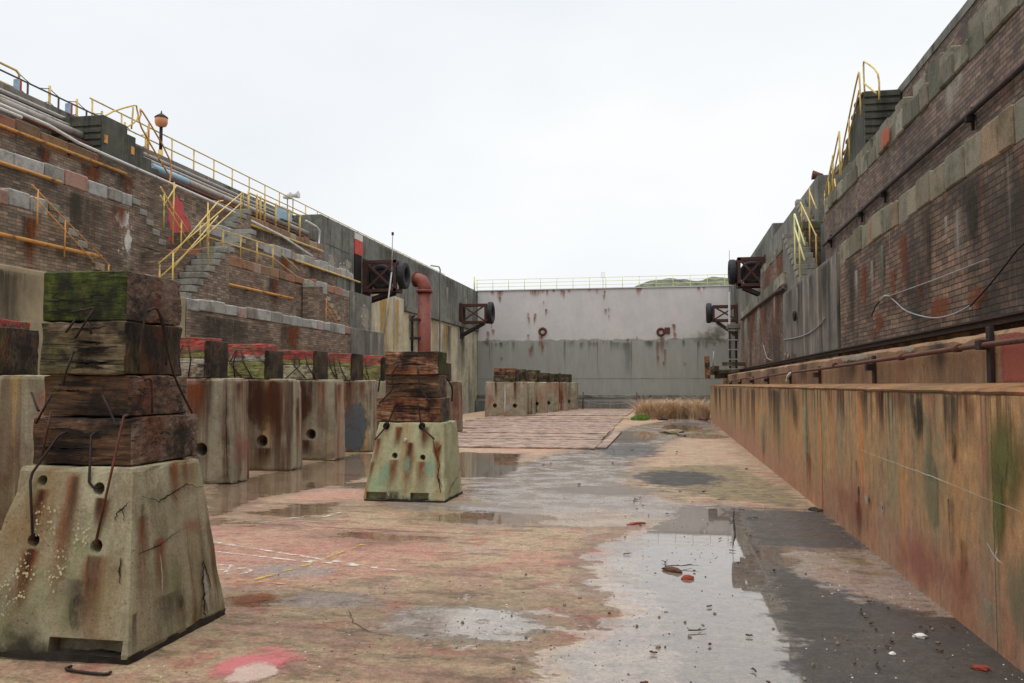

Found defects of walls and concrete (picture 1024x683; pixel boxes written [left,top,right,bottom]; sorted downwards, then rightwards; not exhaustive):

peeling [115,210,132,252]
corrosion [239,380,364,430]
damp [911,395,922,431]
corrosion [390,427,441,476]
corrosion [62,475,76,536]
crack [115,484,202,520]
corrosion [21,549,36,582]
crack [202,561,211,619]